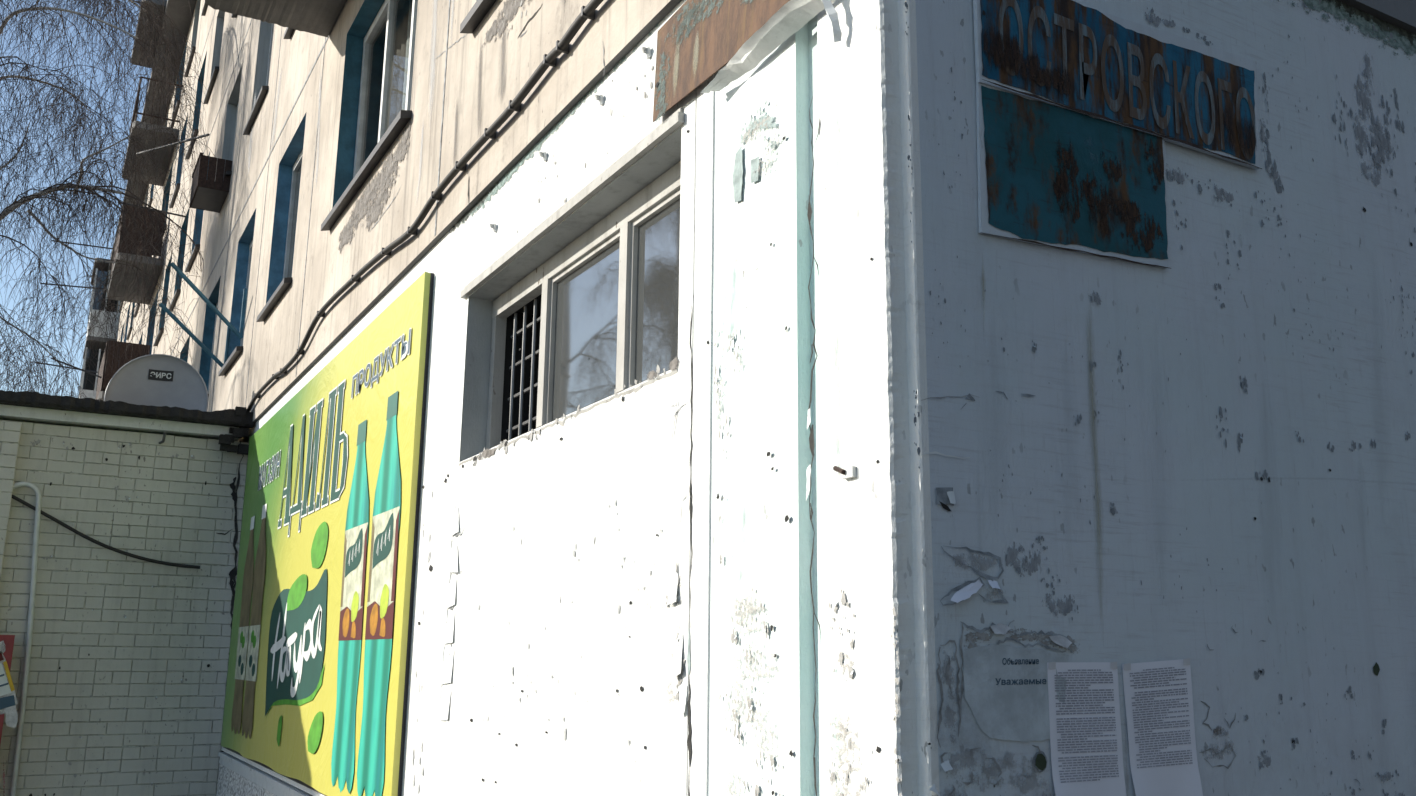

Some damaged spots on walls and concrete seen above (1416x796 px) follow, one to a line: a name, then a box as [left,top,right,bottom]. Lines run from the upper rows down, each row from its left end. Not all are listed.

peeling [732,100,786,203]
peeling [1333,53,1416,211]
crack [665,294,692,596]
crack [807,64,821,796]
crack [217,441,243,630]
peeling [1002,536,1079,621]
crack [685,632,693,796]
peeling [716,587,793,796]
peeling [826,715,902,796]